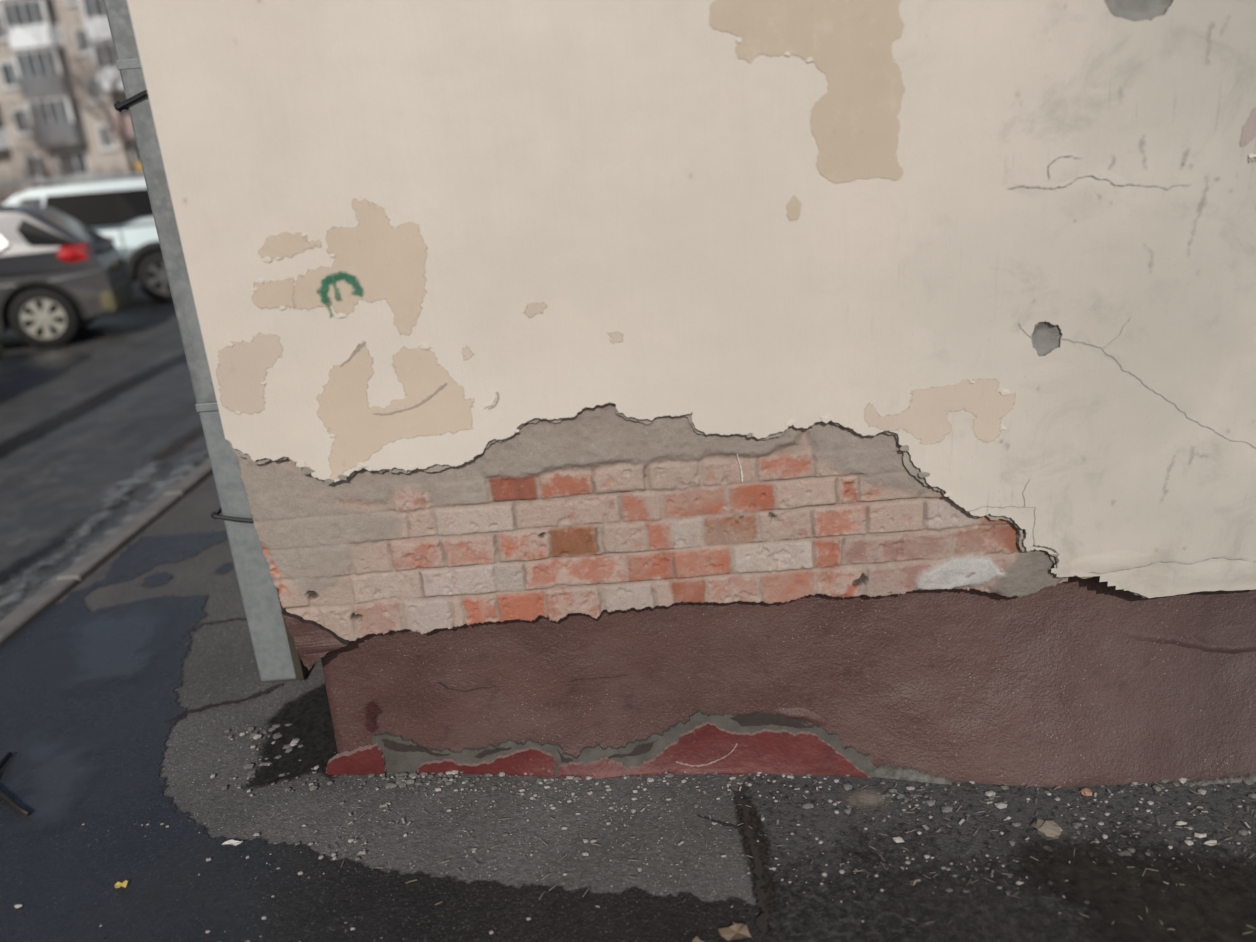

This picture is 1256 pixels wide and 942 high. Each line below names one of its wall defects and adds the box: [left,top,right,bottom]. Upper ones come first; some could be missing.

spalling [1104,0,1172,22]
peeling [709,0,906,183]
peeling [1240,107,1256,163]
peeling [786,195,802,221]
peeling [216,333,283,414]
spalling [228,199,1094,641]
crack [1019,317,1256,448]
peeling [326,710,879,779]